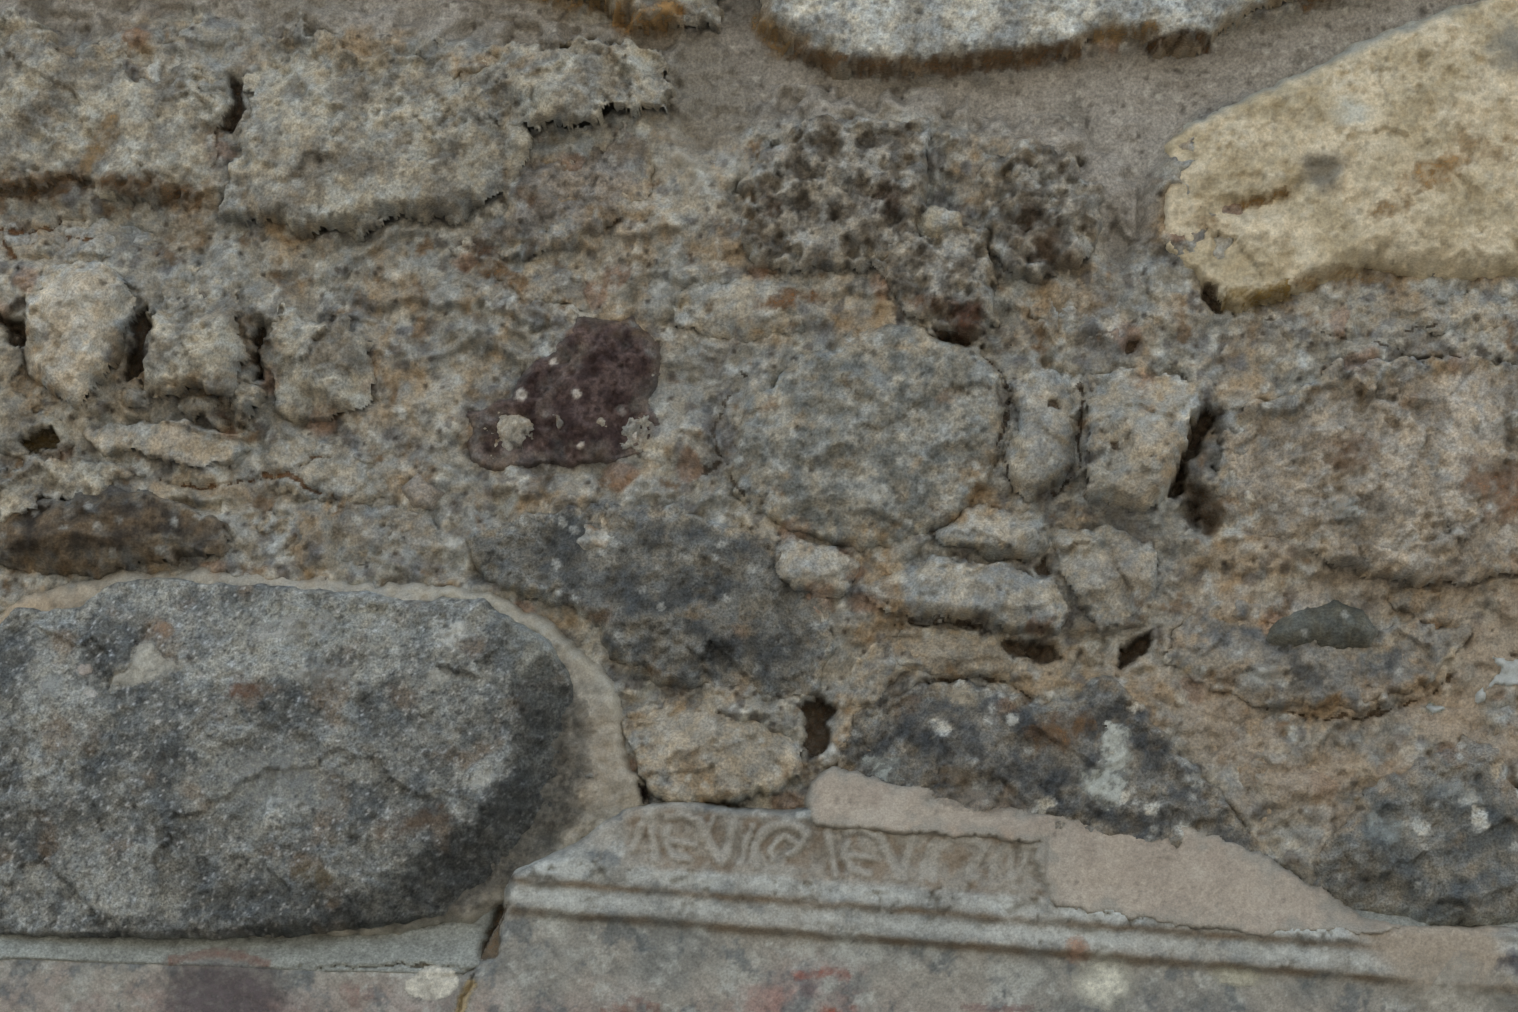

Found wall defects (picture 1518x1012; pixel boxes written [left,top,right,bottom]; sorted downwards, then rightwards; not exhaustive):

crack [320,961,449,969]